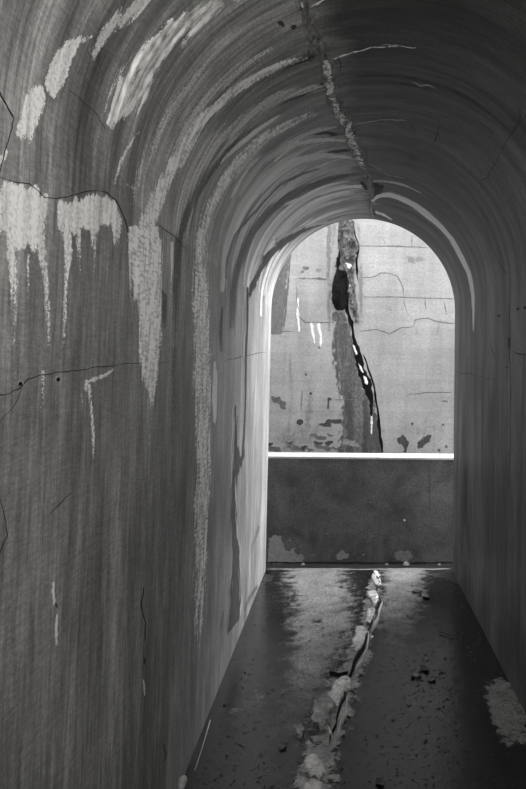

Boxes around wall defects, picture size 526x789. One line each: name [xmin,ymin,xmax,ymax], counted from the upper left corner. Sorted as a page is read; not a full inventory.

crack [0,92,128,234]
crack [275,0,455,453]
damp [371,180,475,330]
crack [0,362,166,423]
damp [0,44,362,646]
spalling [397,416,444,452]
crack [0,499,8,553]
crack [327,571,383,743]